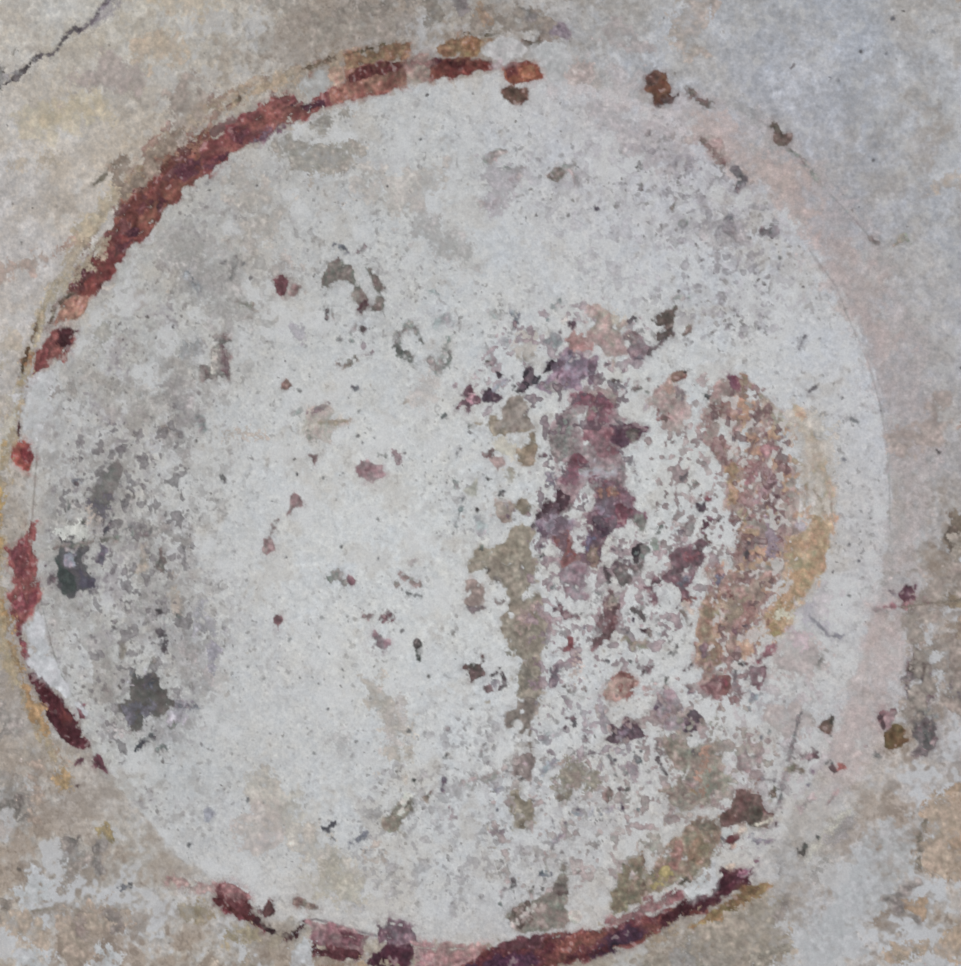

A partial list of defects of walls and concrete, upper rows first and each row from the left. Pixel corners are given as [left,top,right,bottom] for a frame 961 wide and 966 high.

crack [0,0,127,99]
peeling [477,32,532,74]
peeling [691,132,738,173]
peeling [732,89,826,189]
peeling [860,227,918,252]
peeling [196,330,237,386]
peeling [39,478,172,580]
peeling [258,240,862,938]
peeling [7,861,58,917]